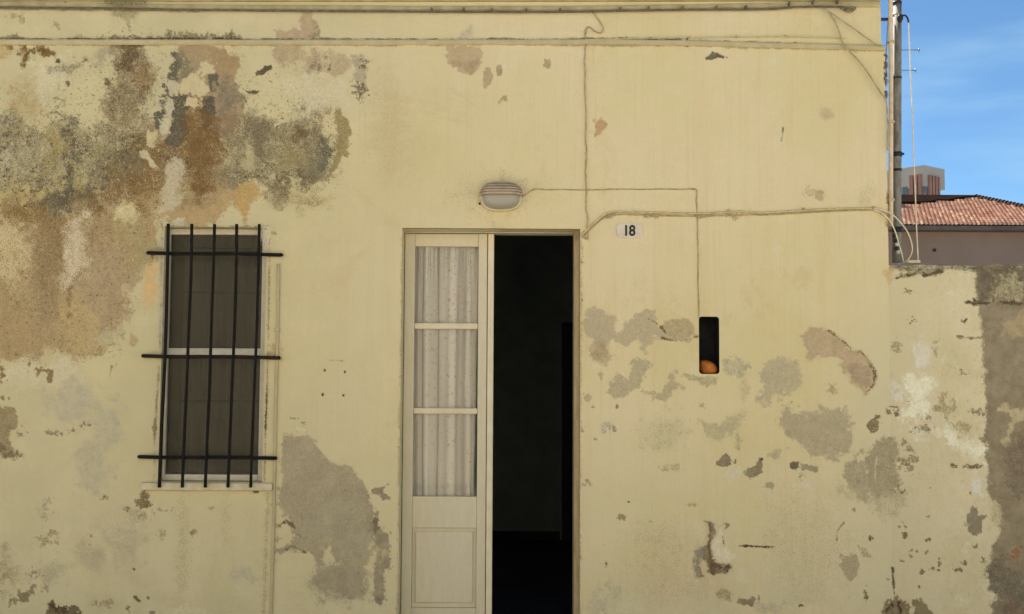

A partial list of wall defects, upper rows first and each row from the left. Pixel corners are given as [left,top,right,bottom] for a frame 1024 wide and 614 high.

peeling [444,25,502,89]
water stain [466,37,884,52]
water stain [0,0,453,602]
peeling [577,243,918,614]
flaking render [274,432,393,609]
water stain [897,522,942,589]